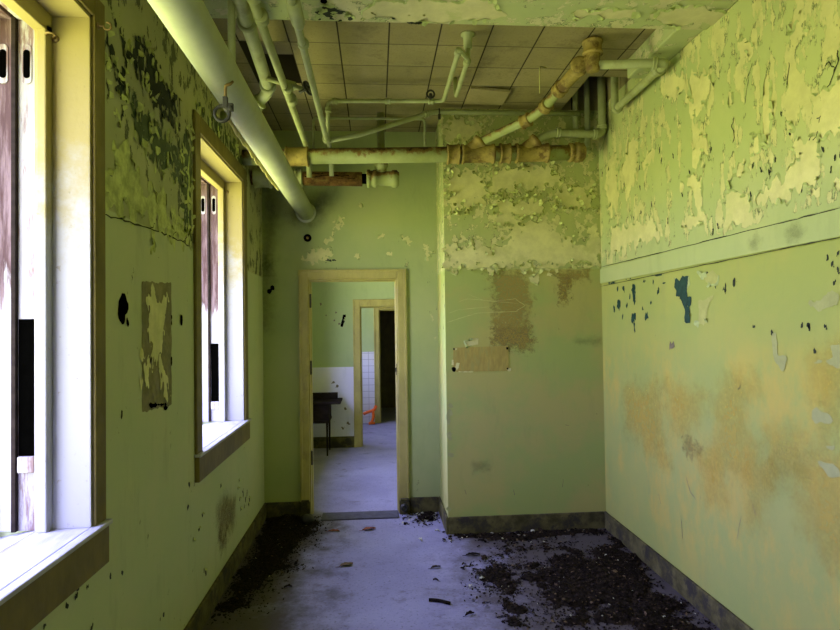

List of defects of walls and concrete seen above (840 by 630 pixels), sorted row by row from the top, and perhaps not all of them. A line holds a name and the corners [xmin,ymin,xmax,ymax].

peeling [314,0,507,27]
peeling [658,66,714,119]
peeling [105,18,196,255]
peeling [195,98,243,166]
peeling [680,71,840,236]
peeling [301,214,345,266]
peeling [423,137,668,286]
spalling [608,270,737,332]
peeling [808,251,840,312]
peeling [139,281,183,412]